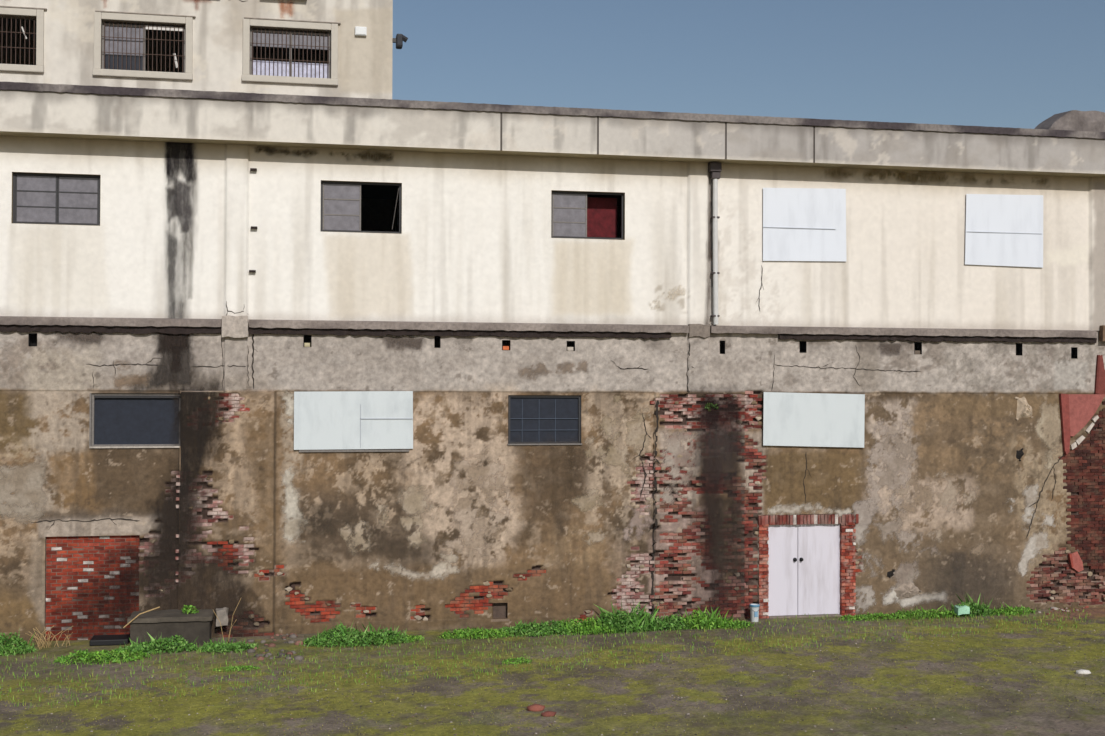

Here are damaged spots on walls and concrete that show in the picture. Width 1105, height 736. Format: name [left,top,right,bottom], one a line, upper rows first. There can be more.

damp [166,142,196,319]
spalling [205,393,250,426]
spalling [138,534,163,597]
damp [75,333,250,635]
spalling [166,471,284,582]
peeling [283,468,308,542]
spalling [285,587,375,623]
spalling [445,570,546,618]
damp [702,397,742,615]
spalling [585,391,976,619]
crack [1026,453,1065,538]
spalling [1011,355,1105,608]